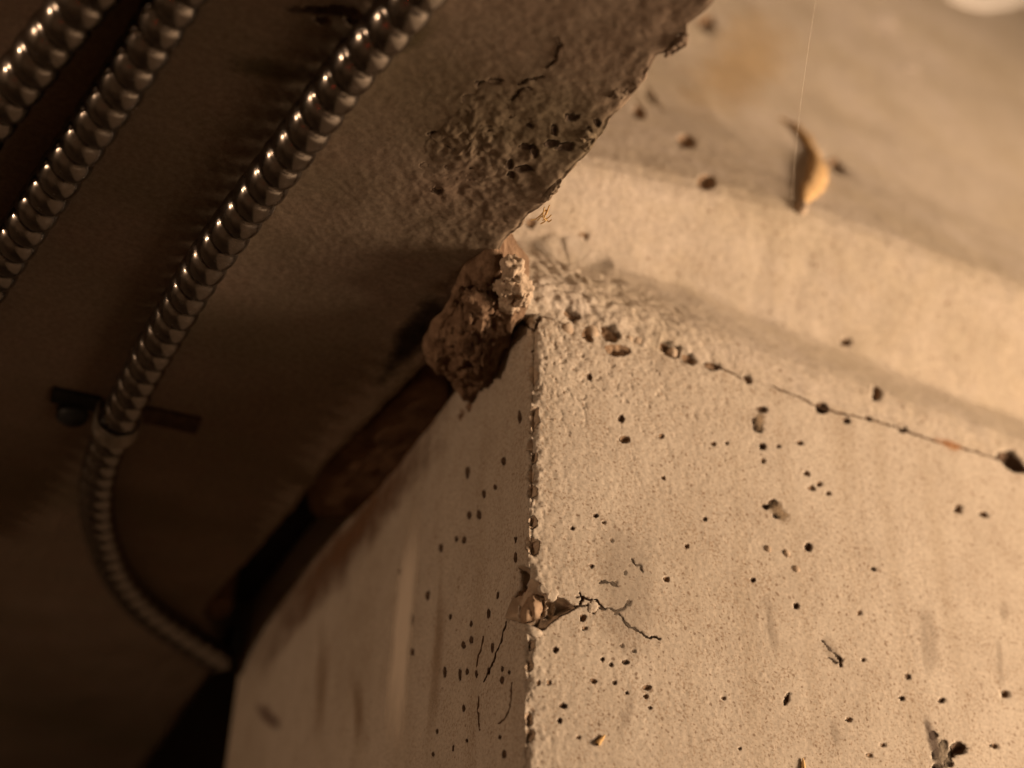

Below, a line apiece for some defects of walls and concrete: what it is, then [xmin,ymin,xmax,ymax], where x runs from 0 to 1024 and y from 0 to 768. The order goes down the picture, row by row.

spalling [420,39,600,194]
spalling [604,79,657,119]
spalling [538,178,562,204]
spalling [529,366,538,386]
crack [519,311,1024,473]
crack [575,580,659,640]
crack [476,621,513,731]